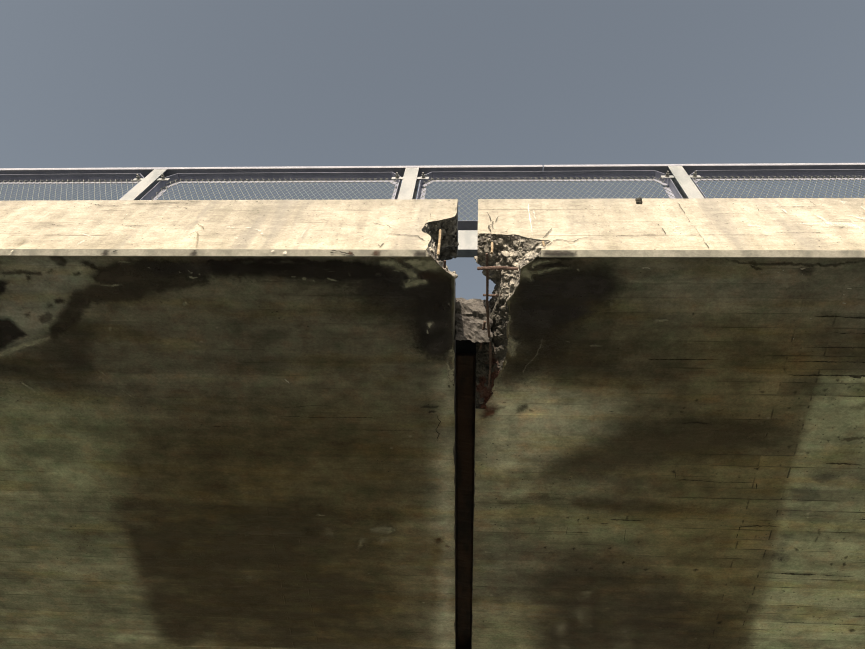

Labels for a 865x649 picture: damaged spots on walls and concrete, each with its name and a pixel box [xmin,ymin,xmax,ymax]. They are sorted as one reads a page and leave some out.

leakage [0,250,452,366]
spalling [422,214,459,285]
spalling [474,233,550,409]
leakage [506,251,618,374]
leakage [736,261,856,273]
crack [788,315,865,379]